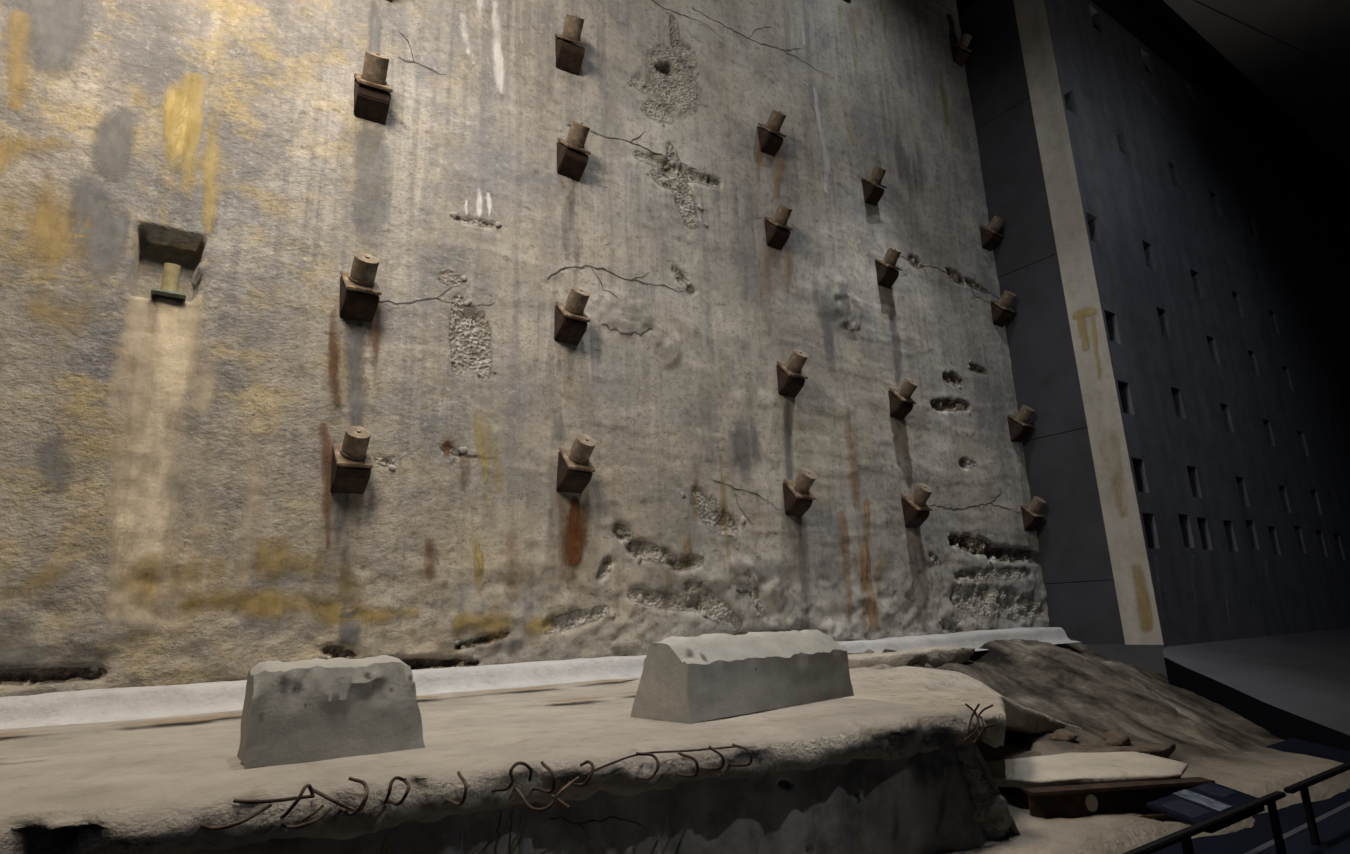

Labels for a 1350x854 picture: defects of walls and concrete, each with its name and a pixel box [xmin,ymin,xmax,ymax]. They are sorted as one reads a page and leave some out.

spalling [627,11,720,229]
crack [547,265,688,301]
spalling [672,266,694,294]
spalling [437,270,497,381]
spalling [930,360,987,415]
corrosion [564,498,586,566]
spalling [597,557,612,580]
spalling [681,489,746,550]
spalling [613,524,828,635]
corrosion [841,470,878,628]
spalling [938,530,1044,633]
spalling [542,605,616,634]